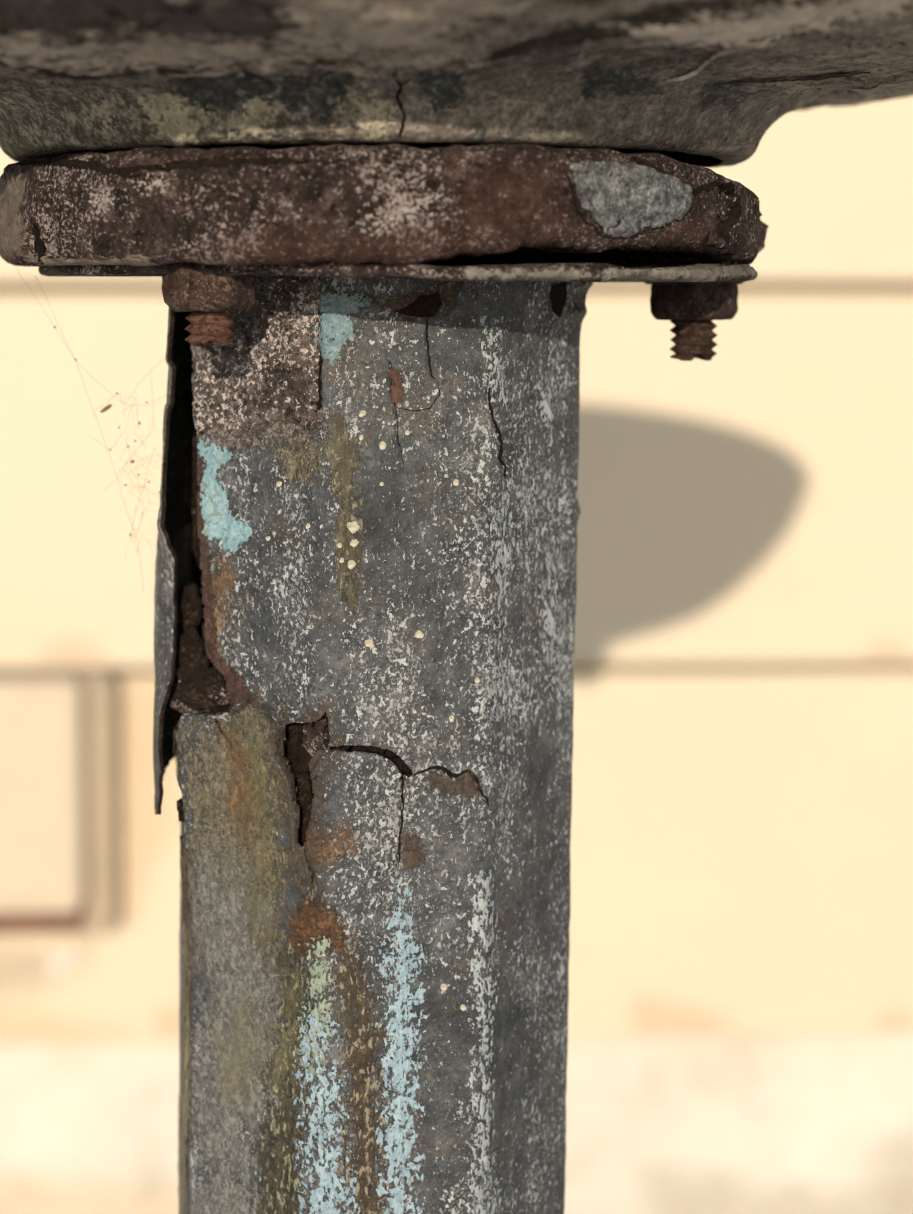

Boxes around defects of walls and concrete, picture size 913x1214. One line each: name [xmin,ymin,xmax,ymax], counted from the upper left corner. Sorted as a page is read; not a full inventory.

leakage [0,0,797,265]
peeling [22,253,158,266]
peeling [385,308,403,351]
crack [388,293,442,468]
crack [488,386,506,480]
crack [168,439,257,776]
spalling [153,277,373,815]
crack [330,745,489,871]
corrosion [180,842,195,1153]